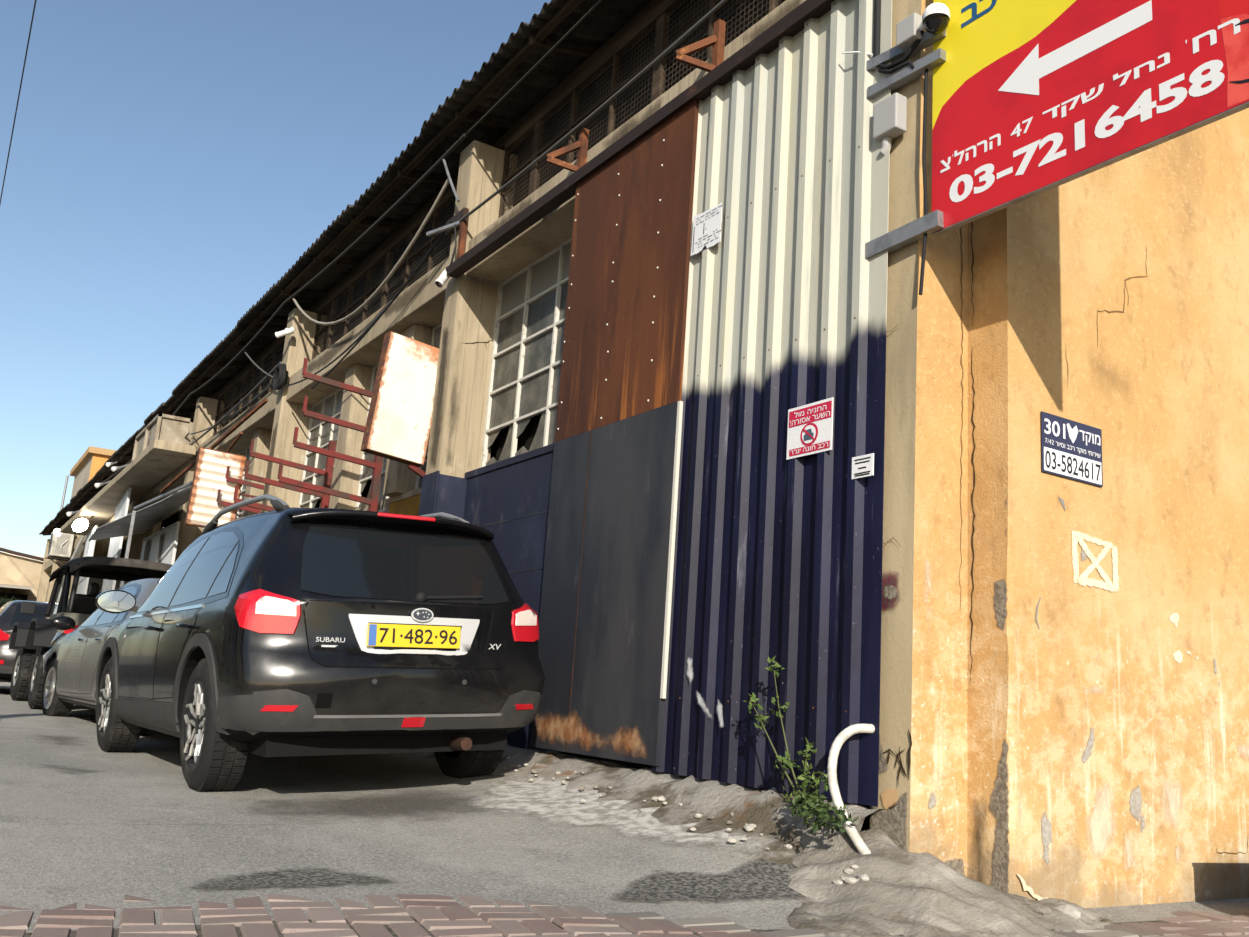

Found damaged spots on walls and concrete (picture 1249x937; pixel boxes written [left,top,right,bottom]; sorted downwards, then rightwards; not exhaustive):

rust [555,98,699,442]
crack [1097,248,1149,348]
rust [536,715,645,753]